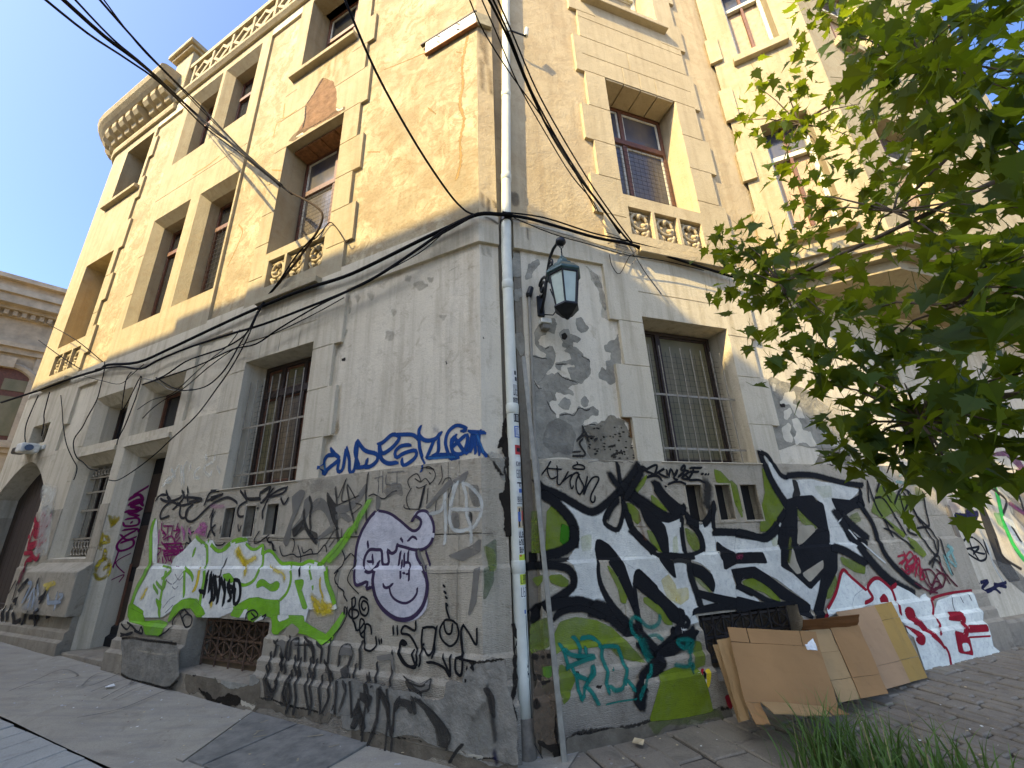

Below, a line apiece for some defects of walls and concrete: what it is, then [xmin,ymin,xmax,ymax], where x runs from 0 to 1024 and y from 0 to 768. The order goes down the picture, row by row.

flaking render [289,78,345,164]
peeling [512,253,540,301]
peeling [515,317,635,463]